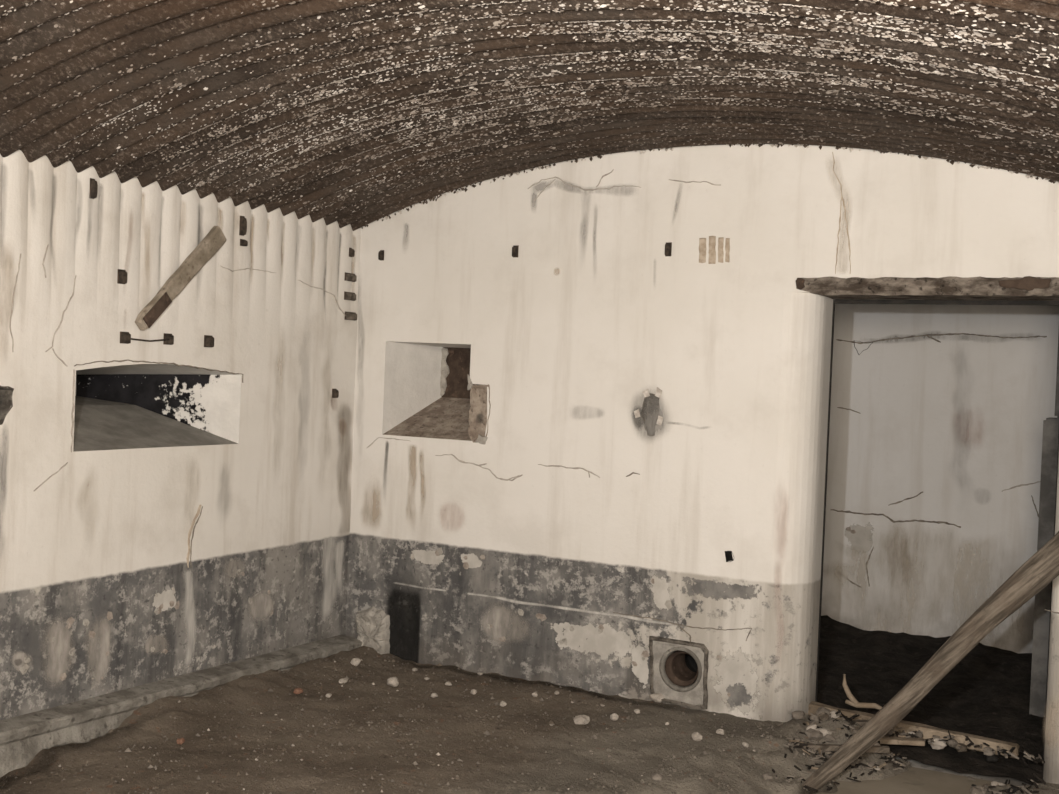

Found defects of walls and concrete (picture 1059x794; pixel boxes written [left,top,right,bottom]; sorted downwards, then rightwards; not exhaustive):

crack [836,333,1047,344]
spalling [634,387,664,436]
crack [435,454,600,481]
crack [830,492,961,528]
crack [1003,481,1040,518]
peeling [411,547,445,565]
peeling [461,553,485,569]
peeling [152,588,180,615]
peeling [650,575,672,611]
peeling [47,611,113,682]
peeling [483,606,650,689]
peeling [712,647,763,721]